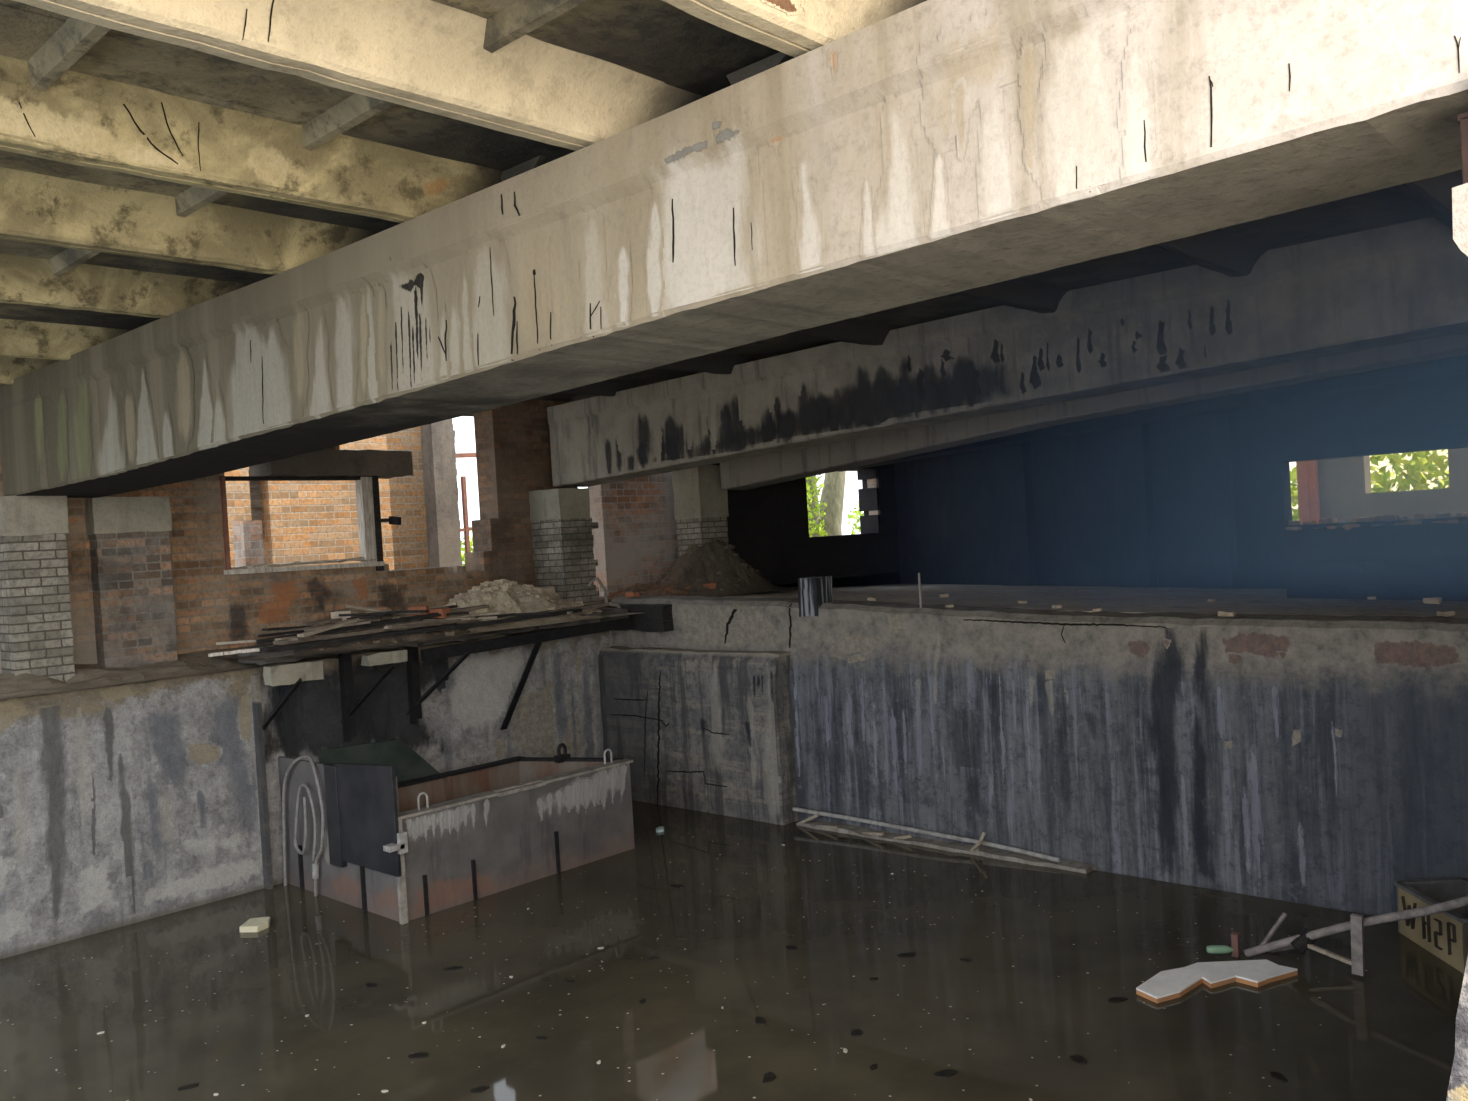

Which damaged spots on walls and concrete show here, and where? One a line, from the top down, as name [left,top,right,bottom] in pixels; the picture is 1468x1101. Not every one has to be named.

damp [0,5,65,61]
crack [242,0,275,42]
crack [123,102,201,171]
crack [1206,76,1214,147]
damp [94,106,770,476]
damp [605,359,975,474]
crack [724,607,737,644]
crack [786,603,794,648]
damp [1139,620,1225,888]
damp [0,680,296,959]
damp [1242,753,1261,878]
peeling [1448,1077,1468,1101]